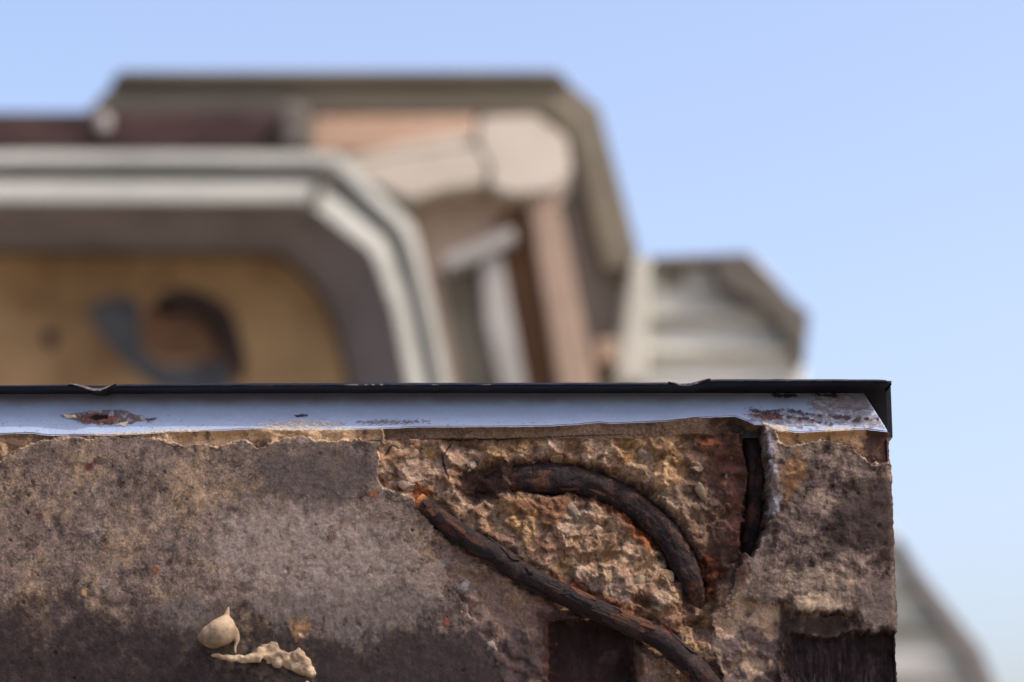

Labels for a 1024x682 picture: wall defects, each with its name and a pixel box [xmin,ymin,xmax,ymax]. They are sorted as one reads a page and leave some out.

corrosion [81,412,118,424]
spalling [0,392,890,682]
corrosion [410,482,703,682]
corrosion [510,431,755,609]